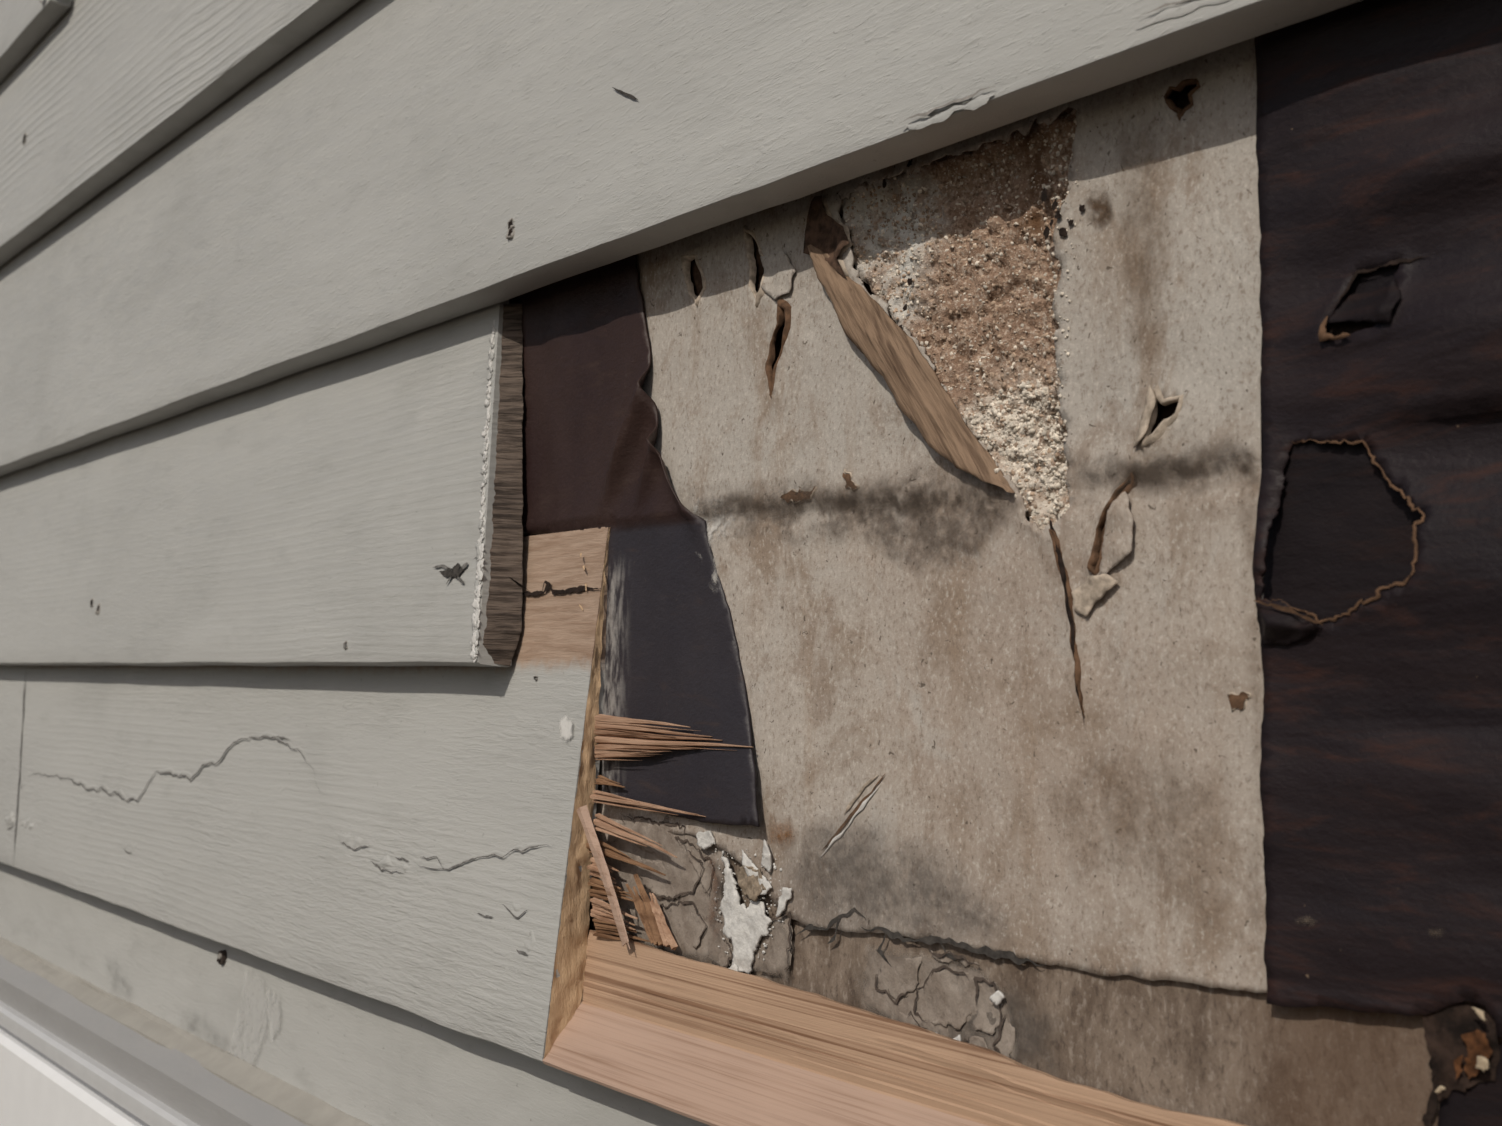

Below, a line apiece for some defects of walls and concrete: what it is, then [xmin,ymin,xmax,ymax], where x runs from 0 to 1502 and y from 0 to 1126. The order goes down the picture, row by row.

peeling [808,244,1015,493]
water stain [1090,459,1204,485]
water stain [693,494,802,539]
water stain [820,488,978,551]
crack [13,666,322,858]
crack [797,907,1043,967]
peeling [1475,1056,1490,1072]